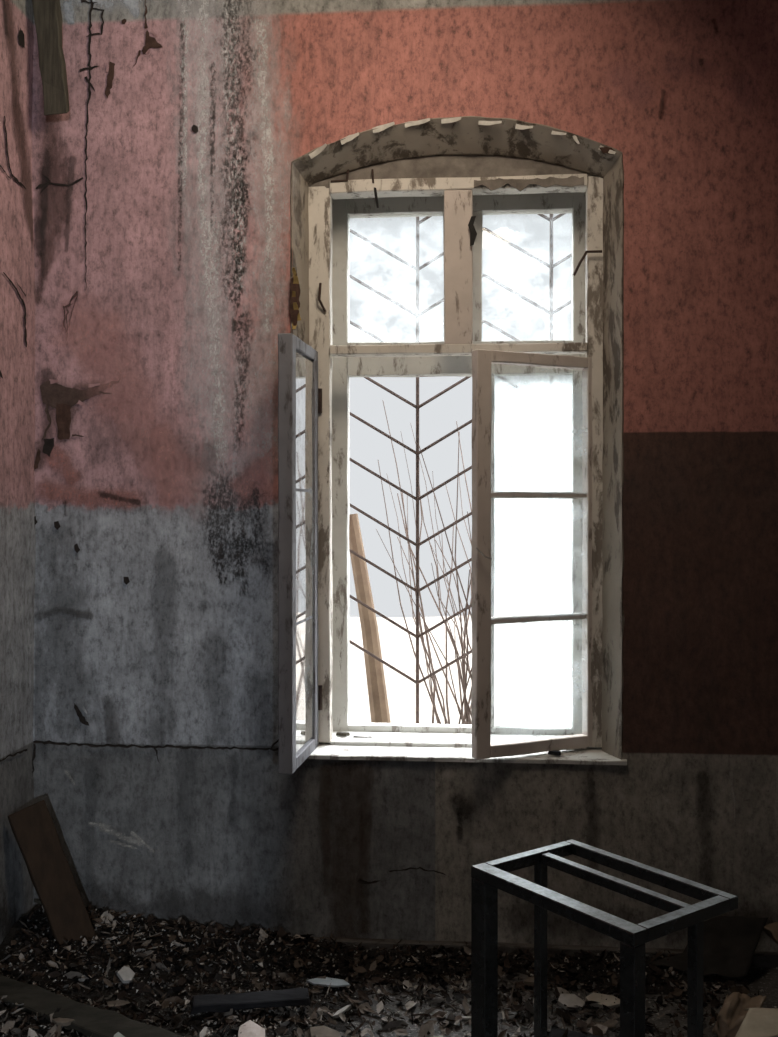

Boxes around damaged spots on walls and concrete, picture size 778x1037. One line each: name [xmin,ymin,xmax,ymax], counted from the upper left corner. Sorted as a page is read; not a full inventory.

crack [0,0,104,347]
water stain [178,0,275,458]
spalling [34,378,121,470]
water stain [203,477,270,594]